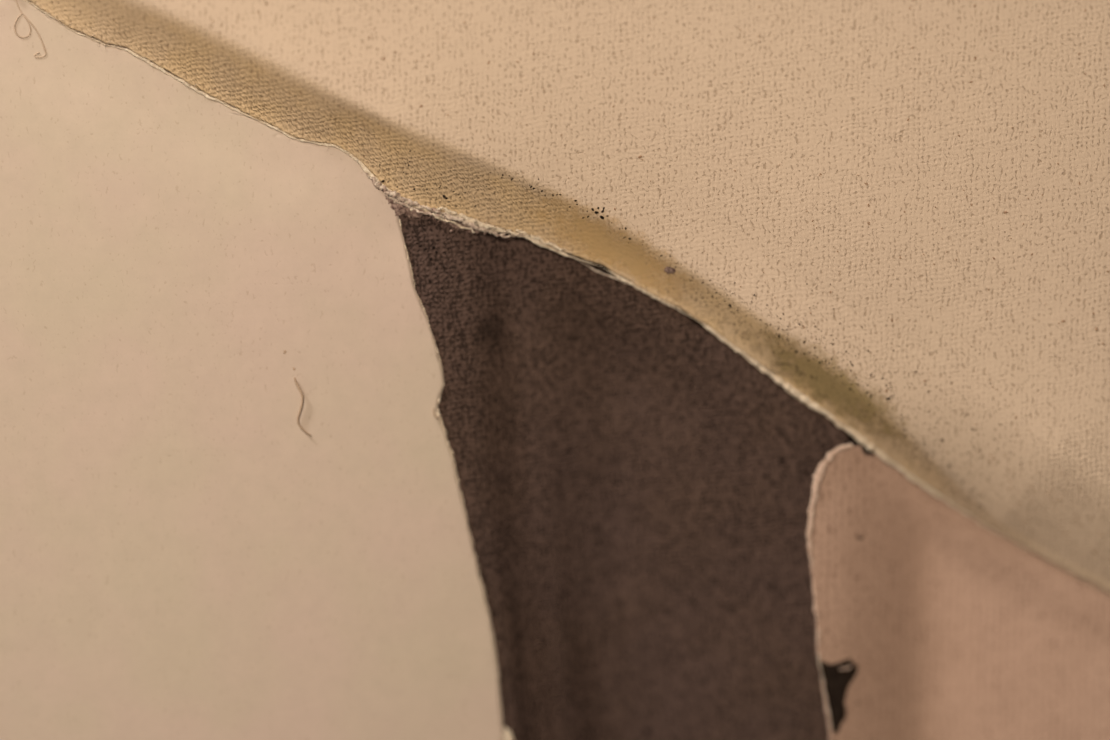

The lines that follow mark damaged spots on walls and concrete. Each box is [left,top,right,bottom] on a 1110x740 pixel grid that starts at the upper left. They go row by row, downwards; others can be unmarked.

spalling [366,173,572,253]
peeling [817,655,859,740]